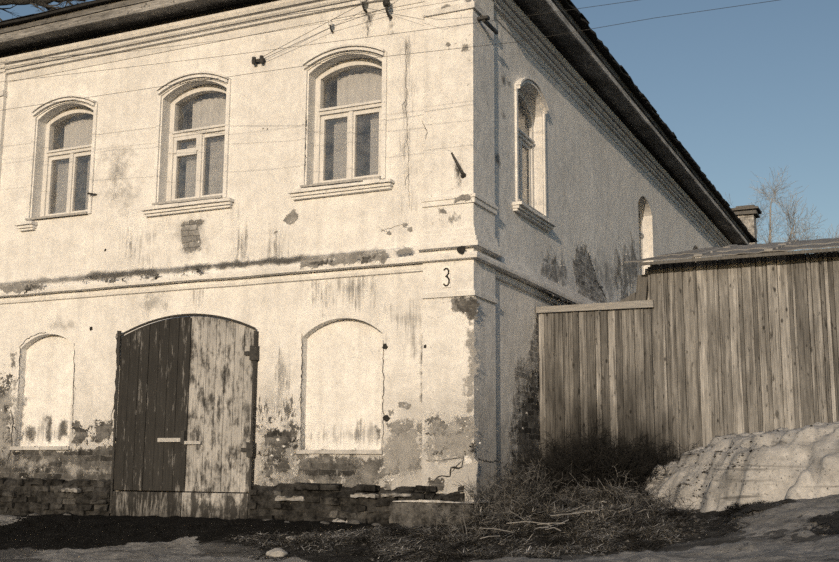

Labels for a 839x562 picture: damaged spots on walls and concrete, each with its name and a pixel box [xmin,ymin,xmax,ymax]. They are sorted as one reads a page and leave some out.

crack [402,43,427,195]
flaking render [181,219,204,253]
flaking render [282,210,298,225]
water stain [7,250,382,286]
flaking render [541,245,605,303]
flaking render [620,245,640,300]
flaking render [0,353,116,481]
flaking render [256,296,481,490]
flaking render [427,477,446,493]
crack [427,450,506,481]